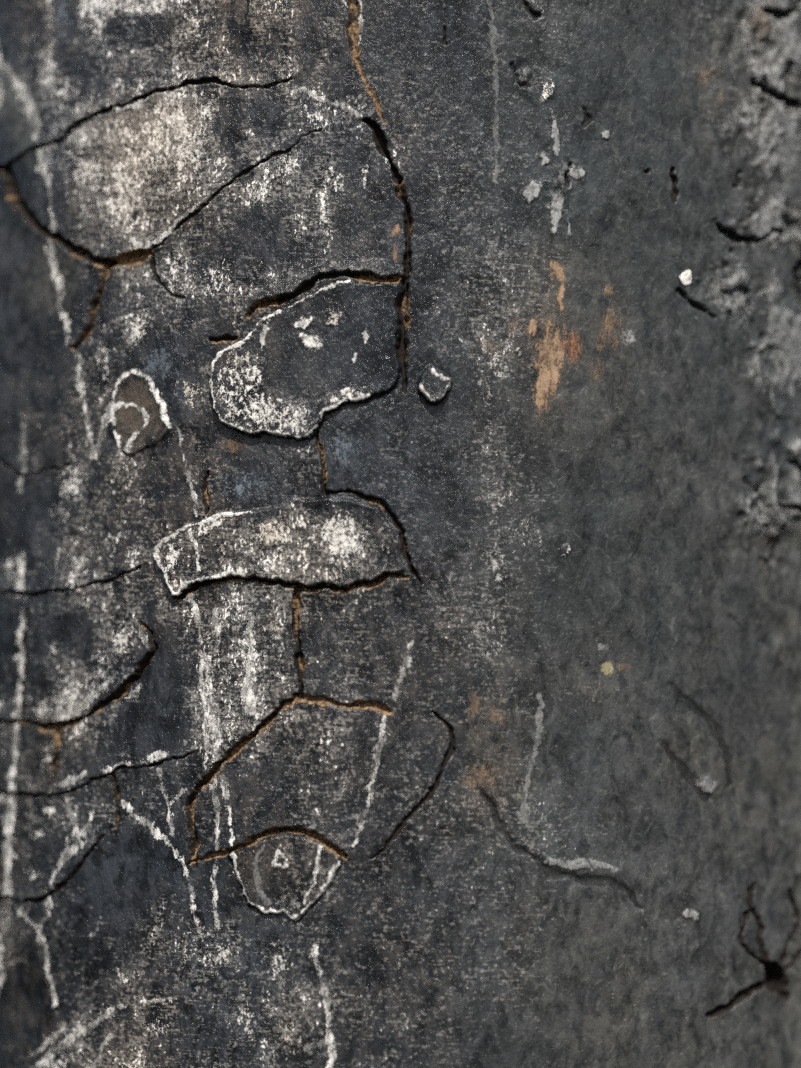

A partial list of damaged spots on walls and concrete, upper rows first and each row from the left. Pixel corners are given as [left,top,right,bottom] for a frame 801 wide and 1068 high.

crack [0,77,323,352]
crack [208,0,414,394]
crack [441,26,449,46]
crack [0,430,456,904]